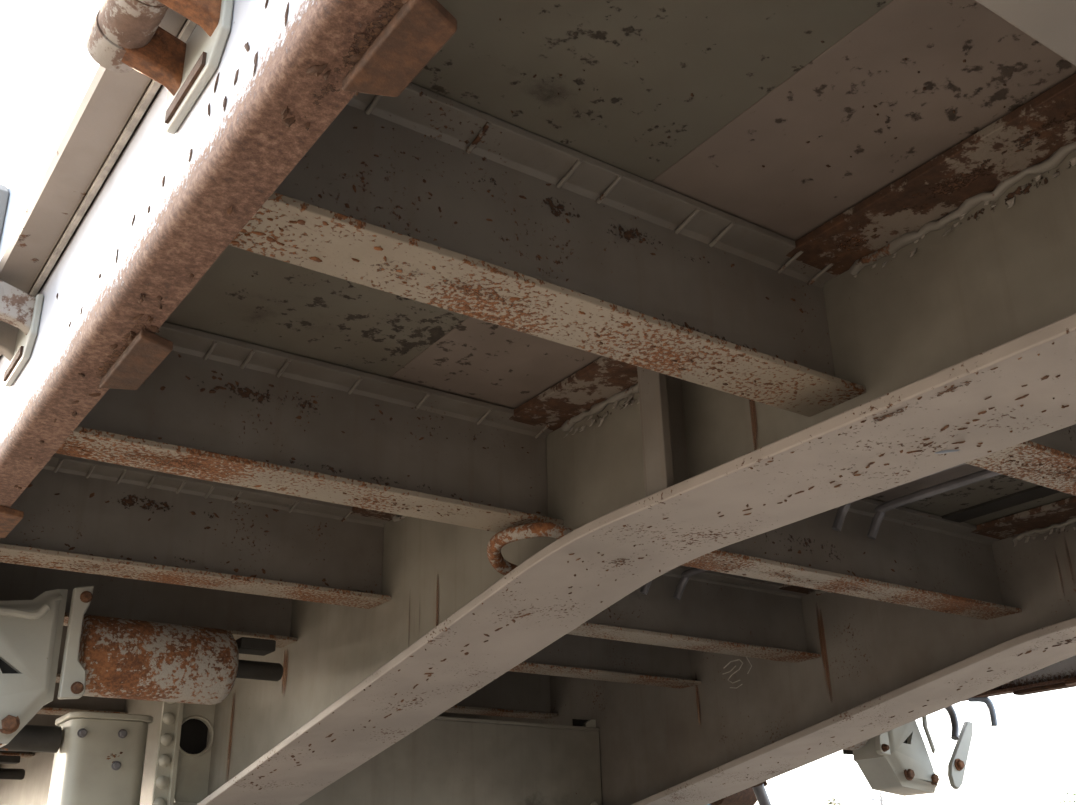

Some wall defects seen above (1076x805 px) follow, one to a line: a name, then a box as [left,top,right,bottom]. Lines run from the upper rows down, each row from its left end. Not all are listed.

corrosion [306,0,409,109]
corrosion [903,104,1076,209]
corrosion [230,218,305,246]
corrosion [371,247,531,317]
corrosion [72,294,162,417]
corrosion [706,334,757,385]
corrosion [185,371,283,405]
corrosion [1006,456,1076,484]
corrosion [89,493,173,521]